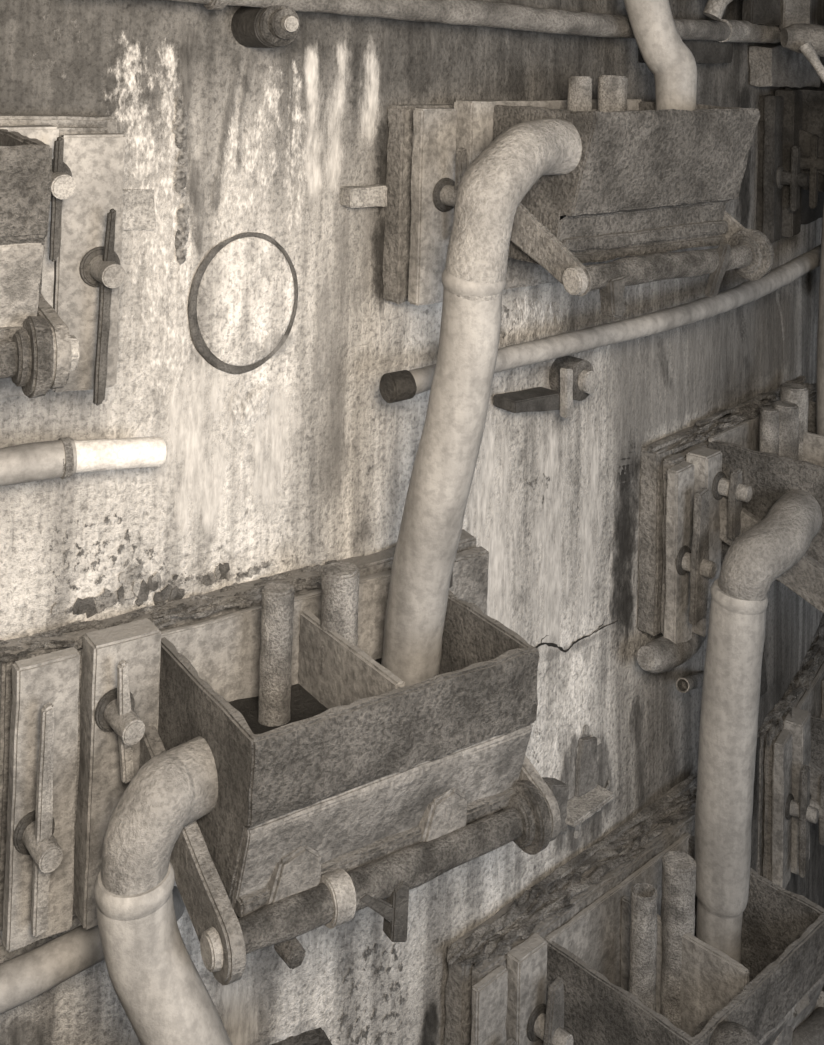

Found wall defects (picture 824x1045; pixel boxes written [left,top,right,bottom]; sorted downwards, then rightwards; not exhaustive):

efflorescence [214,46,346,244]
water stain [361,28,390,186]
water stain [363,206,385,305]
spalling [51,556,293,618]
crack [536,615,617,655]